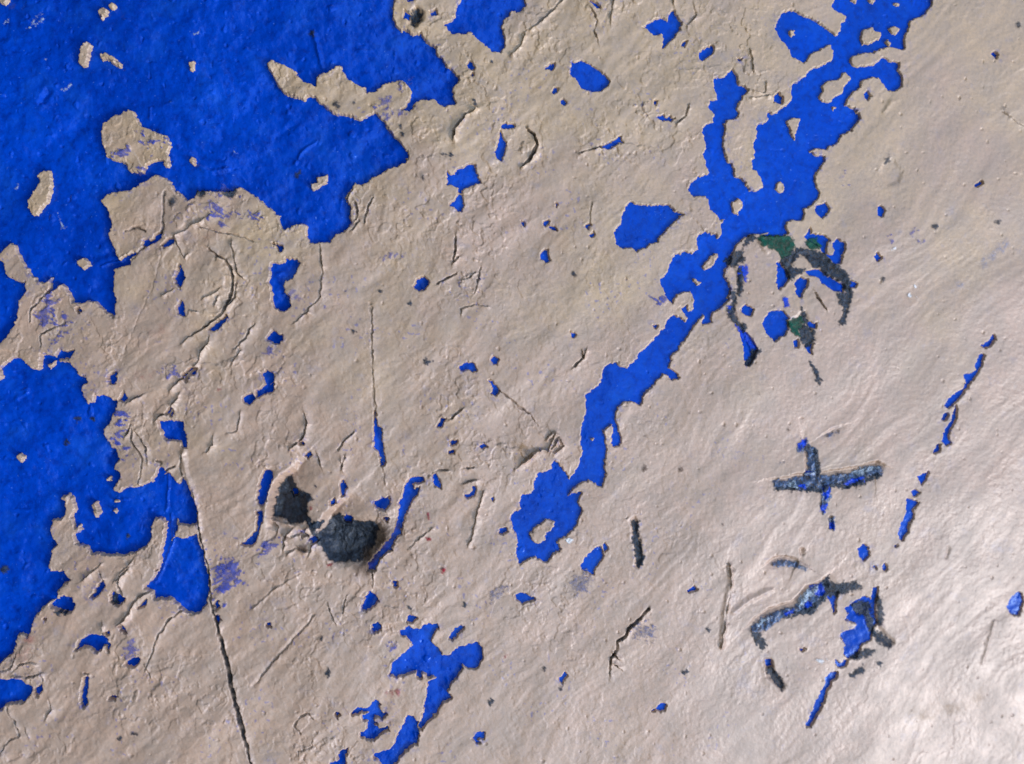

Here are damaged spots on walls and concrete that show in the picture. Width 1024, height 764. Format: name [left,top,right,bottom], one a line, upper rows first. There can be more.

peeling [430,0,525,52]
peeling [0,0,458,344]
crack [204,254,238,328]
peeling [499,0,931,568]
peeling [933,335,994,453]
peeling [0,350,220,663]
peeling [581,543,607,574]
peeling [0,678,43,709]
crack [197,513,252,764]
peeling [336,615,483,764]
crack [610,608,649,663]
peeling [751,578,894,726]